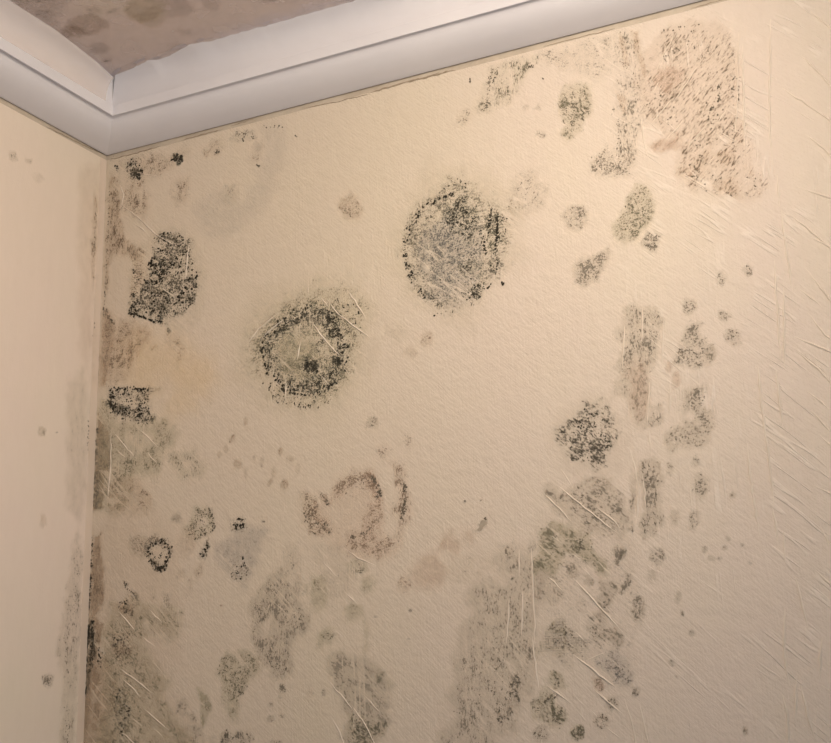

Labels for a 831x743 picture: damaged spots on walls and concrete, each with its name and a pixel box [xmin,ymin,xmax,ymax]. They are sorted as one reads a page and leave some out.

damp [479,51,556,111]
damp [558,83,592,139]
damp [591,24,746,196]
damp [403,177,542,317]
damp [87,153,198,510]
damp [249,286,367,410]
damp [555,403,617,467]
damp [620,306,663,427]
damp [334,465,410,556]
damp [59,534,212,743]
damp [217,572,309,713]
damp [448,461,664,743]